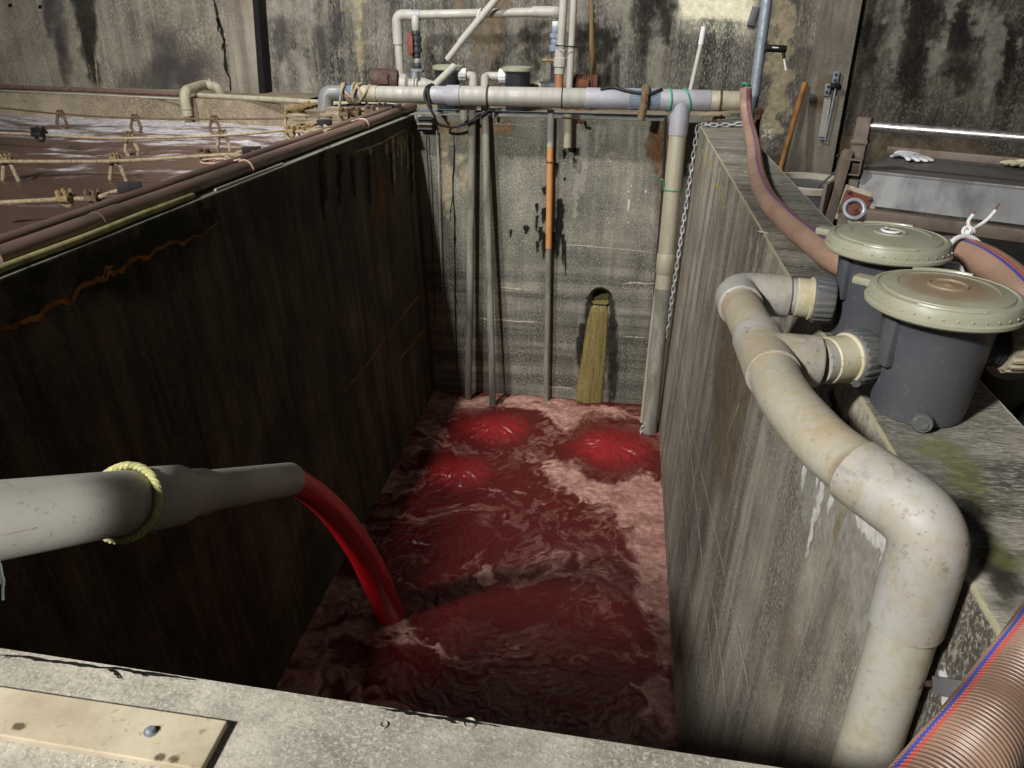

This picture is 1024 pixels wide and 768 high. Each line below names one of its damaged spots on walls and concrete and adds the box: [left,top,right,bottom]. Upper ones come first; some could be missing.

water stain [43,0,101,86]
crack [213,0,231,91]
water stain [893,0,941,98]
water stain [944,9,975,95]
water stain [986,23,1015,96]
water stain [510,124,653,276]
crack [0,221,218,330]